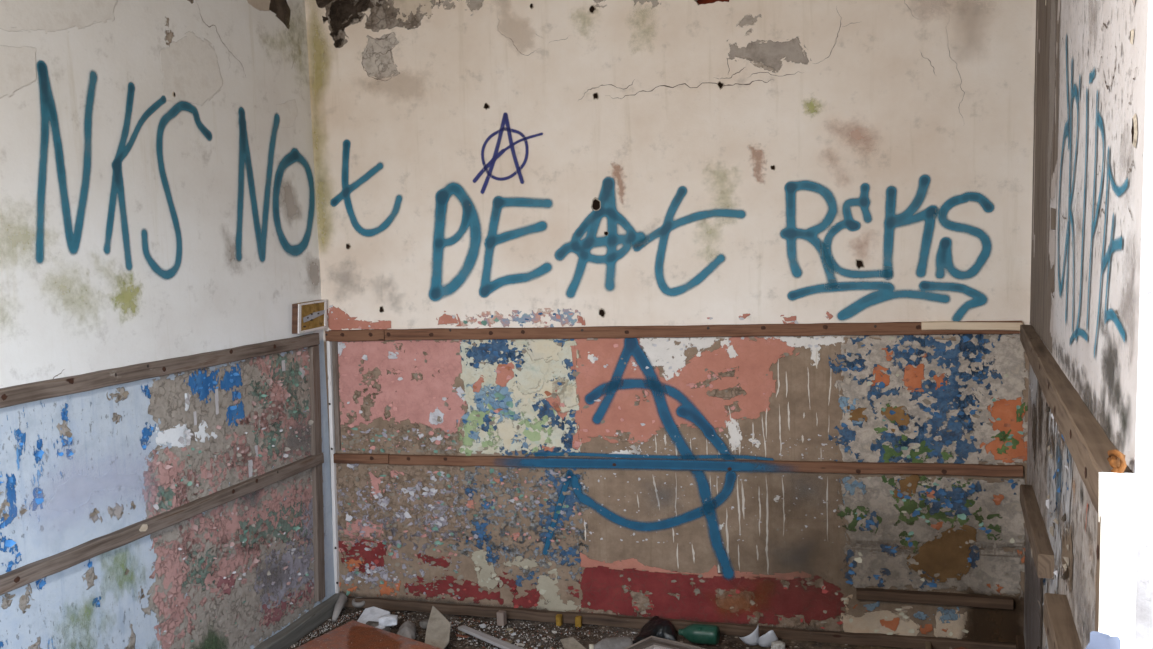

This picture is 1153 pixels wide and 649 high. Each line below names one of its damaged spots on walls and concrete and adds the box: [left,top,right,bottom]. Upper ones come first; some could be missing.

peeling [0,0,117,33]
peeling [160,18,223,106]
crack [579,8,858,100]
flaking render [727,14,811,73]
crack [1059,1,1137,109]
spalling [591,197,601,211]
damp [1053,320,1127,450]
peeling [0,305,1095,649]